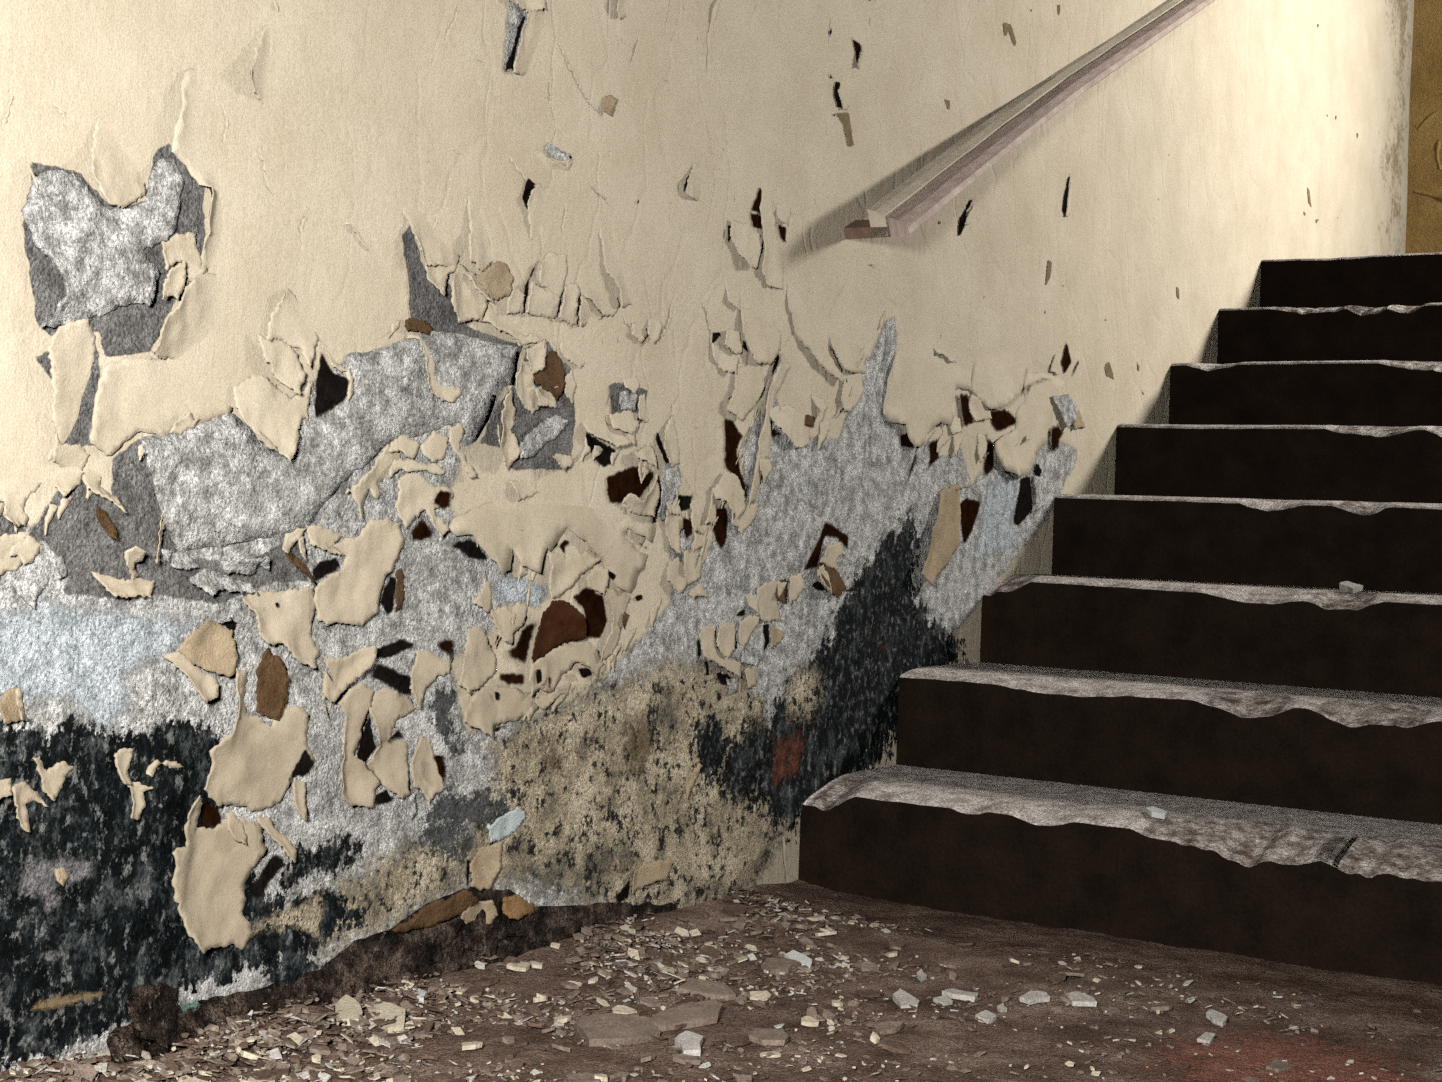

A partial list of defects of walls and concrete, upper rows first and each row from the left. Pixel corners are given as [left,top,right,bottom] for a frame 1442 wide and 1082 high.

peeling [250,0,280,104]
crack [425,0,649,201]
crack [667,146,817,214]
crack [826,0,875,146]
flaking render [0,68,1085,1005]
mould [689,505,969,849]
leakage [0,594,370,1071]
leakage [417,685,519,867]
flaking render [0,1018,133,1072]